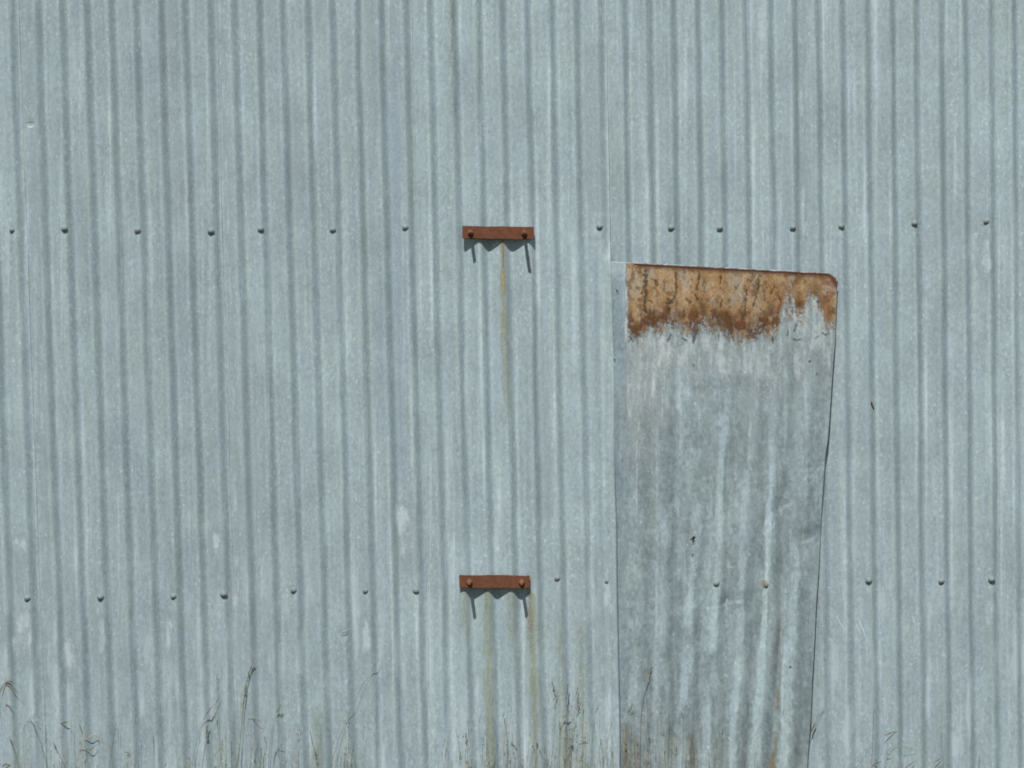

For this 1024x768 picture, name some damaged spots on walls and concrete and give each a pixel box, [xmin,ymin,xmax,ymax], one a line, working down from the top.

rust [626,263,838,345]